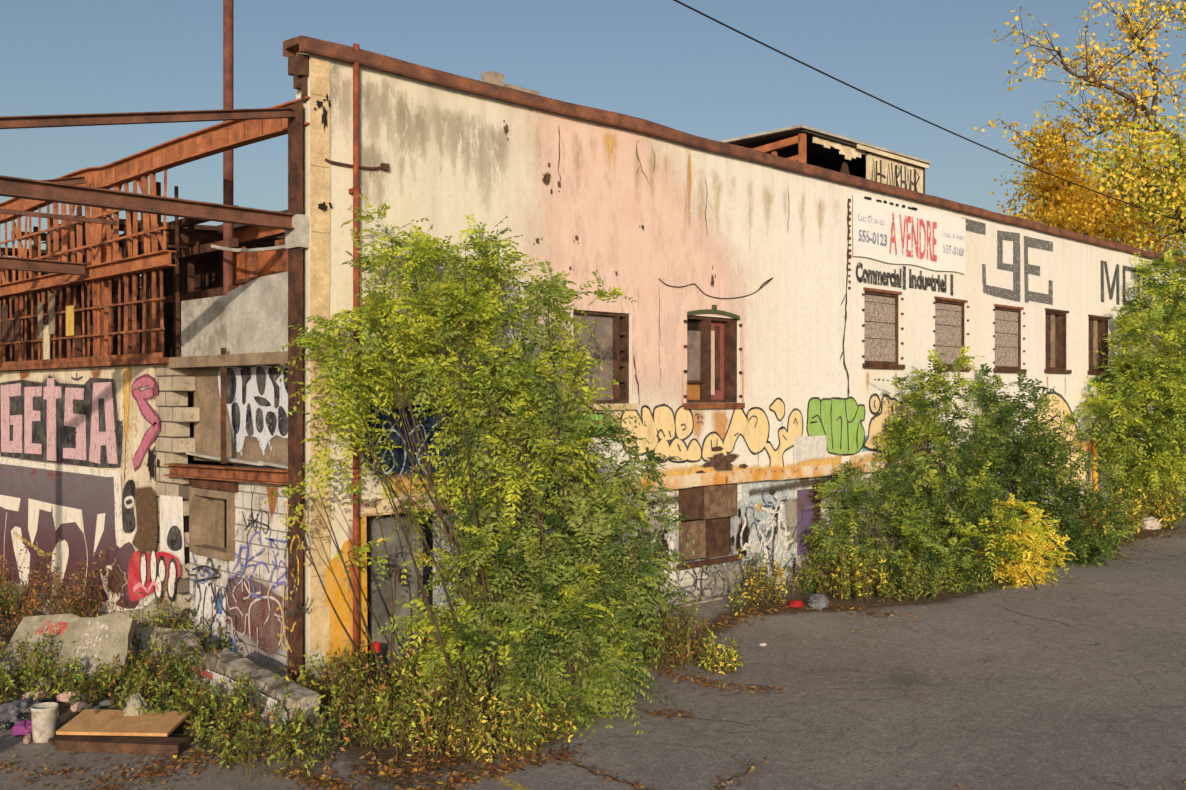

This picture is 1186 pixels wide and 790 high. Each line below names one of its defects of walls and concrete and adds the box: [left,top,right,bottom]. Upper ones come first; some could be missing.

spalling [314,93,331,133]
crack [840,198,851,399]
corrosion [642,465,716,479]
corrosion [733,447,998,471]